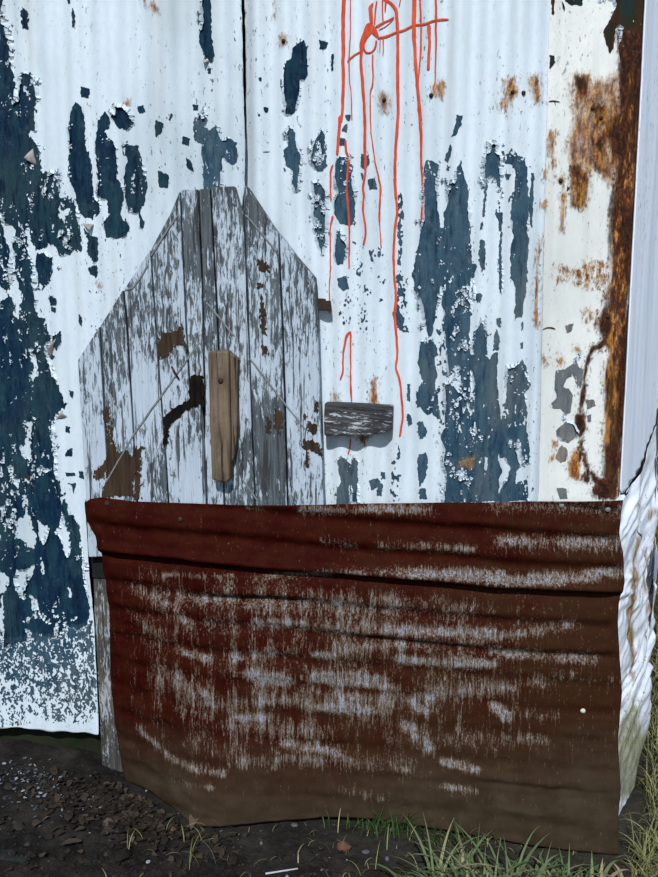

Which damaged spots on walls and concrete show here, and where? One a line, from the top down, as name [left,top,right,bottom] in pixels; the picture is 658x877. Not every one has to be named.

peeling [196,0,215,74]
peeling [551,0,583,14]
peeling [598,0,648,54]
peeling [158,171,169,188]
peeling [155,114,173,137]
peeling [182,104,238,189]
peeling [280,39,536,504]
peeling [0,0,148,727]
peeling [264,408,283,436]
corrosion [84,30,643,855]
crack [625,407,658,496]
corrosion [627,537,656,677]